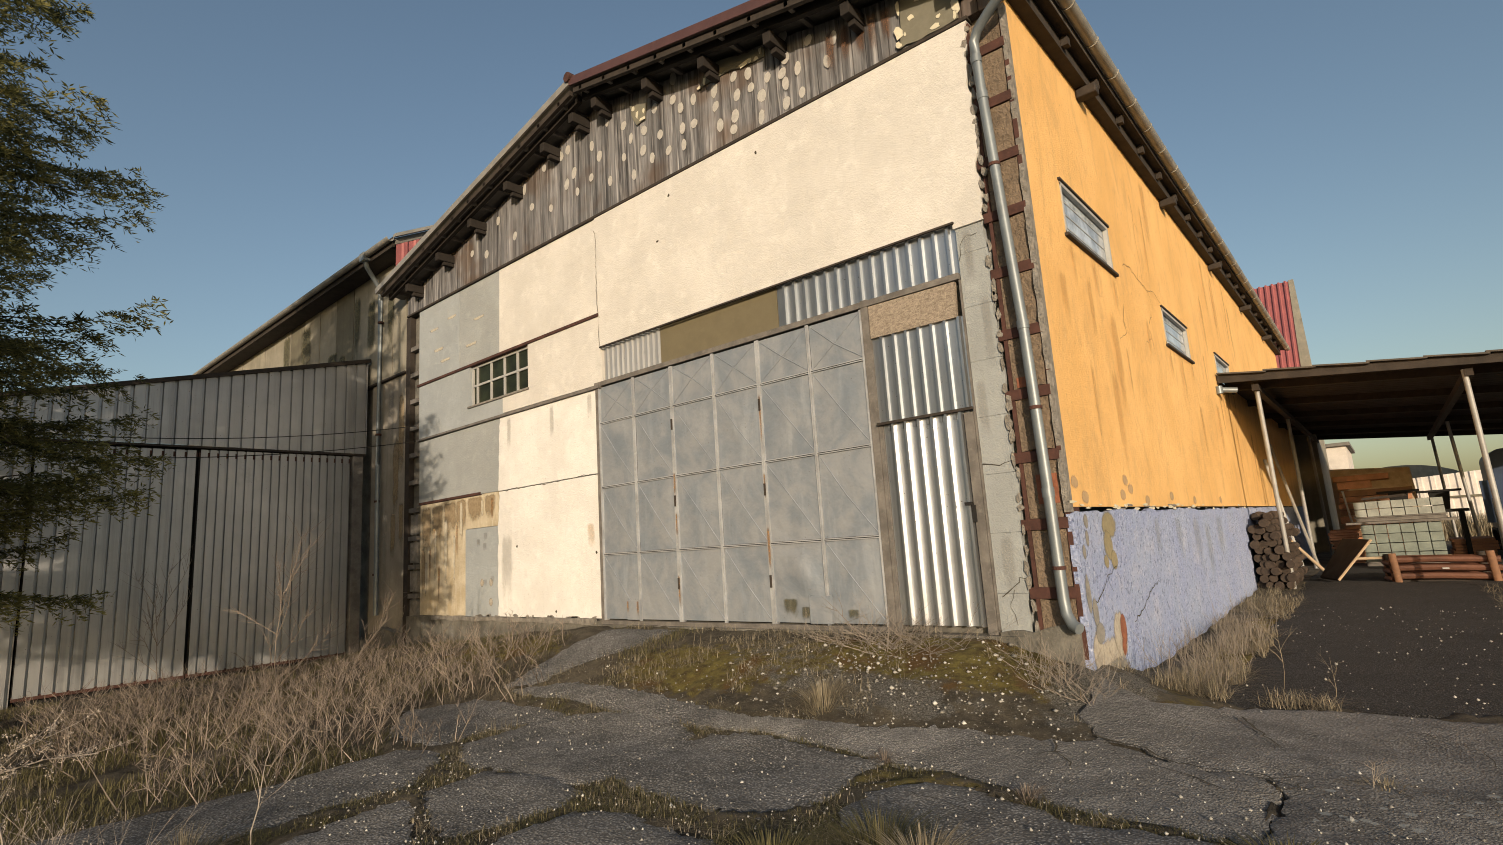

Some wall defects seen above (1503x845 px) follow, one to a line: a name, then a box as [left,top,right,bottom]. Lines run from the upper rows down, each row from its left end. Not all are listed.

peeling [630,102,647,126]
peeling [697,46,765,90]
peeling [894,0,989,212]
damp [421,494,495,592]
spalling [1069,475,1257,669]
crack [1035,740,1072,766]
crack [1100,717,1413,798]